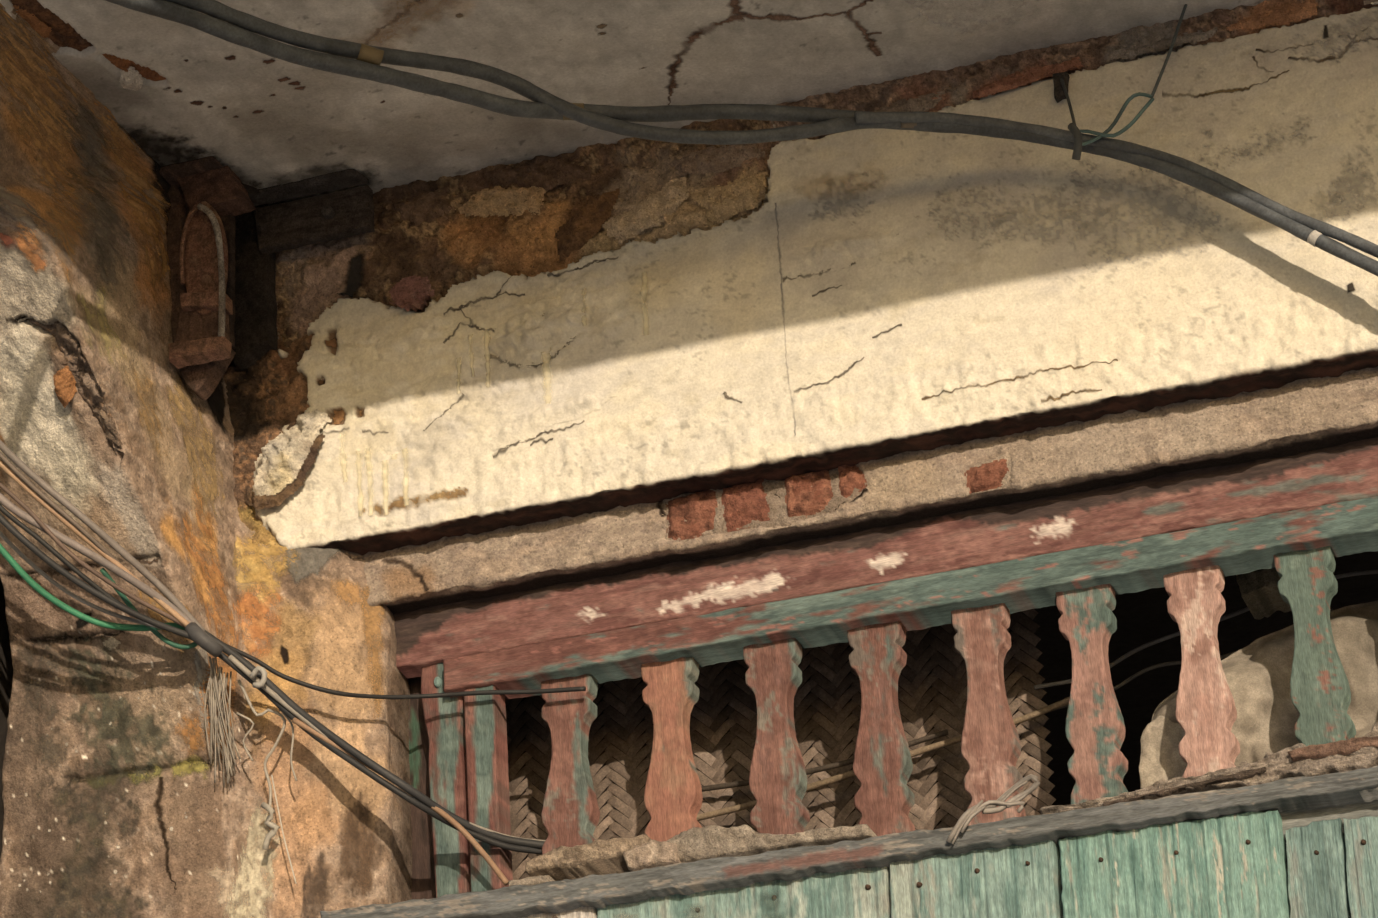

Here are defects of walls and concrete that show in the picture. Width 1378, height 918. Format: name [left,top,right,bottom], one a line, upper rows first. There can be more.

spalling [11,0,264,118]
crack [350,0,424,59]
crack [666,0,882,105]
crack [443,257,618,368]
spalling [223,0,1378,546]
crack [775,203,856,297]
crack [796,323,902,391]
crack [423,393,464,431]
crack [492,421,585,458]
crack [72,758,214,890]